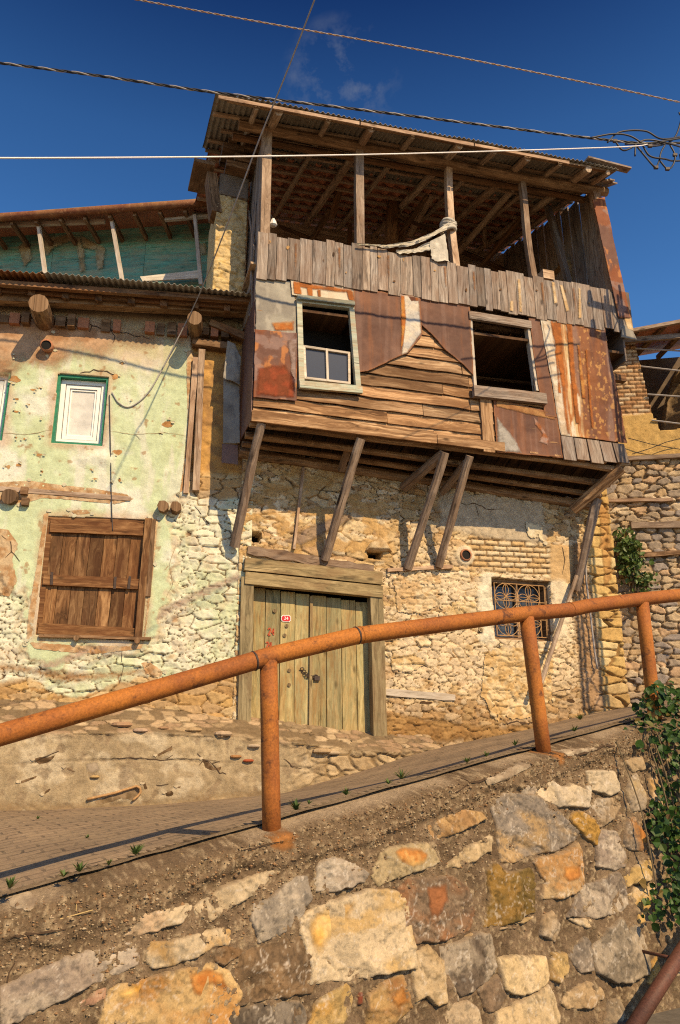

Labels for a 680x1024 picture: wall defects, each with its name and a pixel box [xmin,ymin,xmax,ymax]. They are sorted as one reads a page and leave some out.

rust [257,321,297,397]
rust [497,322,594,444]